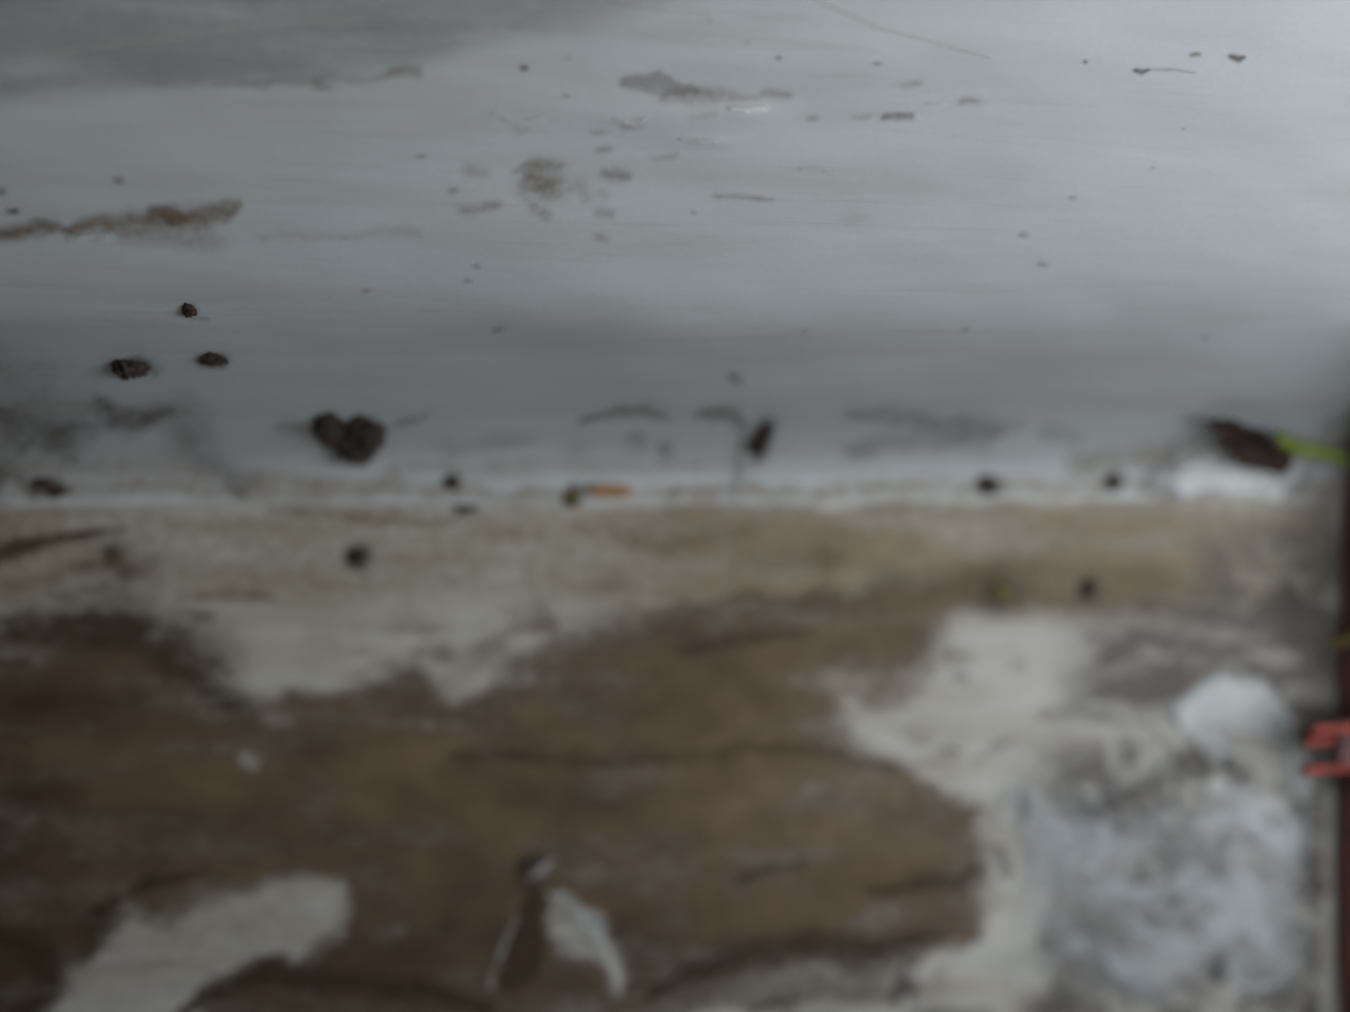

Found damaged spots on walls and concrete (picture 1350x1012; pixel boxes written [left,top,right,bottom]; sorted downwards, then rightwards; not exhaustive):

damp [1174,677,1310,799]
damp [1023,792,1303,1002]